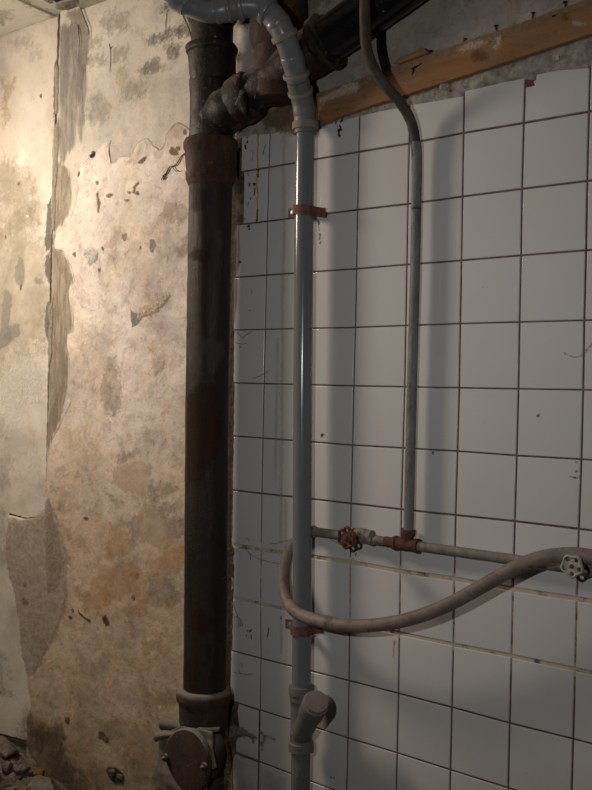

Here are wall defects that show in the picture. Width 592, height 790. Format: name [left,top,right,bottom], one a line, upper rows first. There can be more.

spalling [404,37,592,106]
damp [52,165,71,233]
damp [47,243,72,448]
peeling [0,58,189,790]